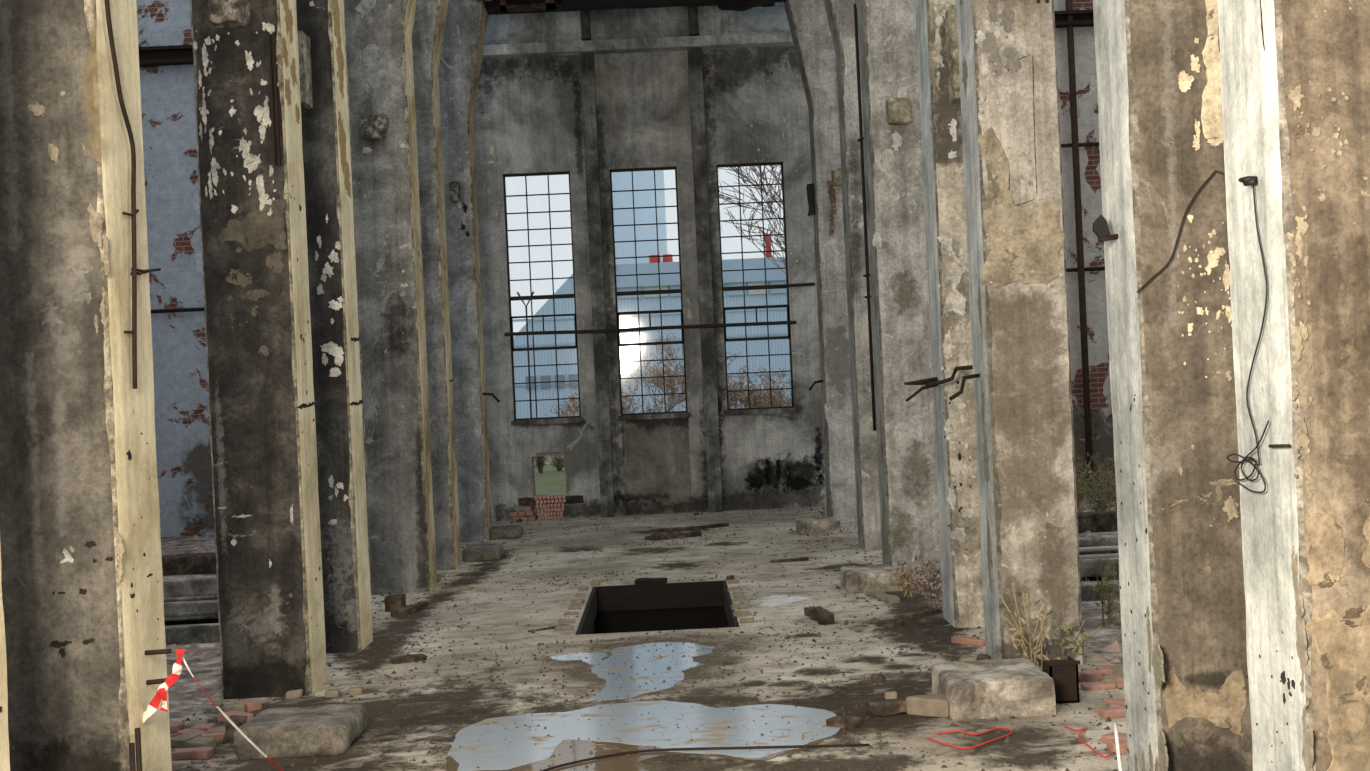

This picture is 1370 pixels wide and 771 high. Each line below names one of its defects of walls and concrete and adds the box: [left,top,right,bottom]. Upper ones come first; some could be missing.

water stain [476,0,511,44]
peeling [1178,0,1223,150]
spalling [183,0,301,329]
spalling [1084,129,1101,228]
peeling [275,315,344,377]
peeling [315,213,344,324]
water stain [481,3,825,518]
spalling [895,0,1067,594]
spalling [1074,330,1109,414]
peeling [1177,222,1232,337]
peeling [1259,176,1370,771]
spalling [1078,606,1258,771]